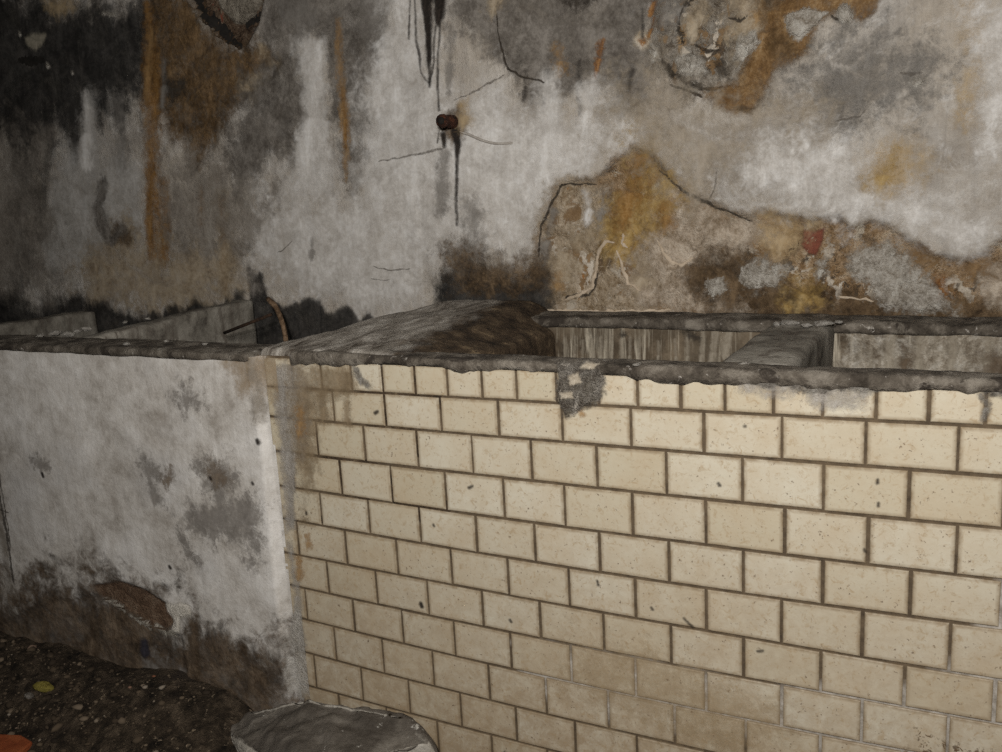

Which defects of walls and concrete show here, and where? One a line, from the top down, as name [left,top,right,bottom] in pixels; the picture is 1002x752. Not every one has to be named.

crack [460,12,545,97]
peeling [709,0,878,114]
rust [144,3,170,264]
water stain [0,0,1002,319]
peeling [532,145,1002,318]
peeling [560,363,597,399]
crack [0,480,14,587]
spalling [96,581,191,638]
water stain [0,544,306,711]